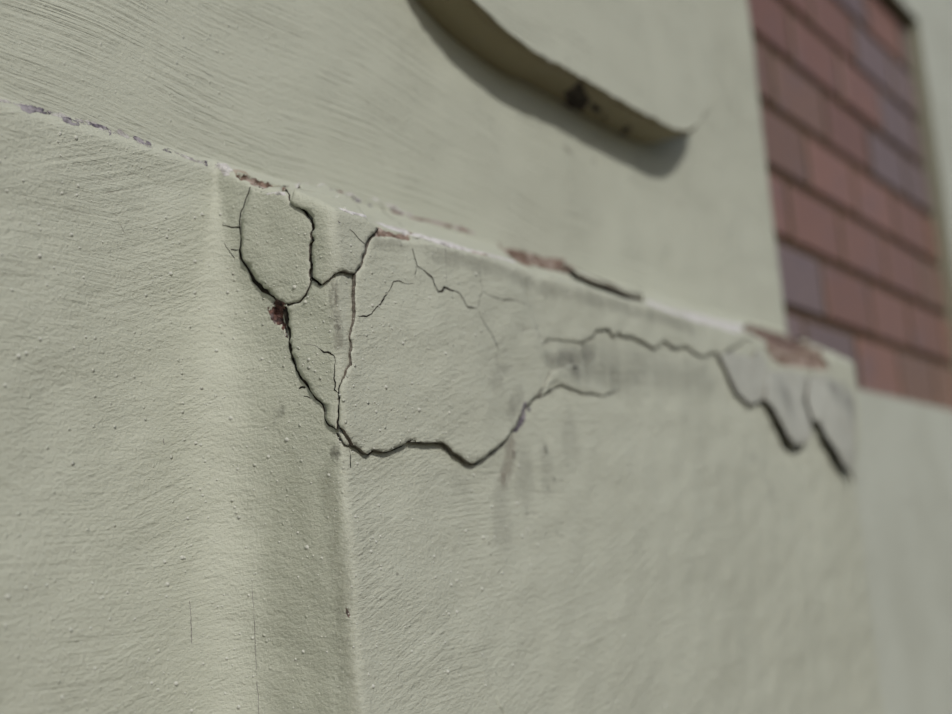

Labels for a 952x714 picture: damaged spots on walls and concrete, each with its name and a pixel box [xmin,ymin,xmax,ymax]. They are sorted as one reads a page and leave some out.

peeling [0,99,152,148]
spalling [563,81,610,121]
crack [351,206,527,362]
crack [222,187,437,467]
peeling [163,148,855,482]
crack [527,379,561,406]
crack [749,400,801,452]
crack [818,423,839,459]